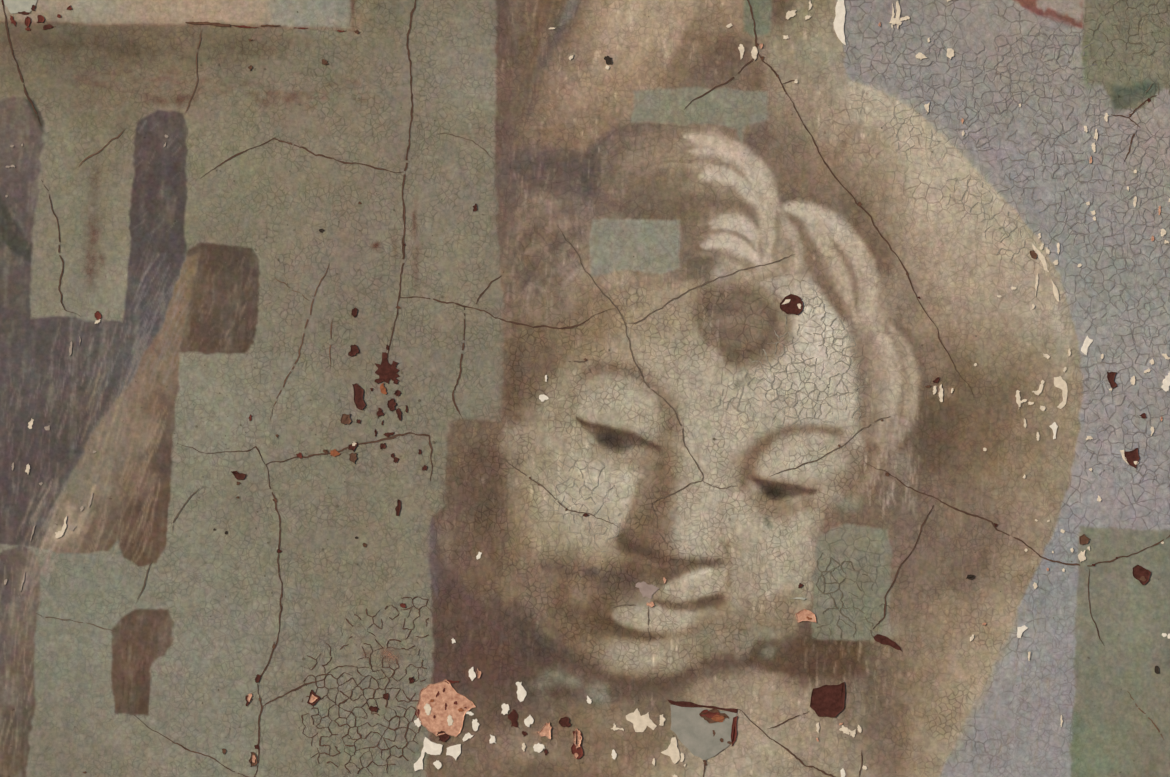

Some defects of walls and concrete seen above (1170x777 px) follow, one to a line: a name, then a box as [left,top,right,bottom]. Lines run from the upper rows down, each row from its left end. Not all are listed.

peeling [833,0,846,45]
crack [1111,95,1157,161]
crack [42,181,81,317]
crack [685,0,973,394]
peeling [1015,336,1093,441]
crack [769,416,1170,645]
crack [134,432,433,777]
peeling [409,667,496,771]
peeling [501,682,583,759]
peeling [611,700,738,745]
crack [703,709,863,777]
peeling [810,682,862,741]